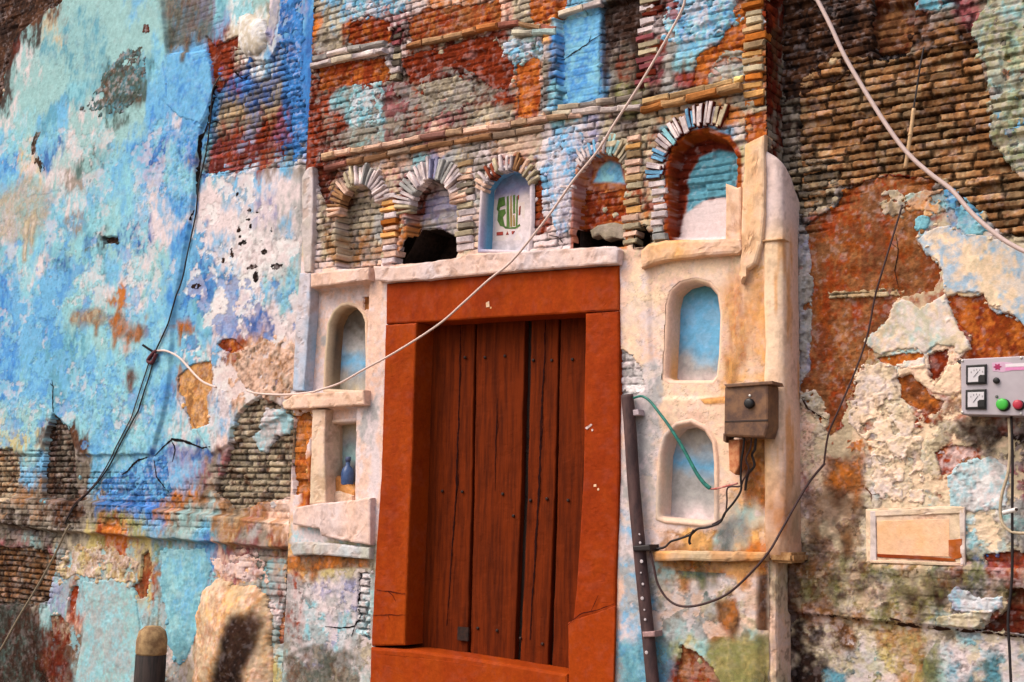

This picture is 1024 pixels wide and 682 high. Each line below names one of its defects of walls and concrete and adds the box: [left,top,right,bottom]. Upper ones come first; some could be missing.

flaking render [0,0,62,105]
peeling [80,46,146,117]
flaking render [781,0,1024,513]
flaking render [39,415,82,504]
crack [122,438,210,492]
flaking render [179,362,213,431]
flaking render [216,335,313,509]
flaking render [621,350,645,396]
peeling [0,541,269,682]
leakage [787,488,878,682]
leakage [881,573,970,619]
peeling [936,586,1024,635]